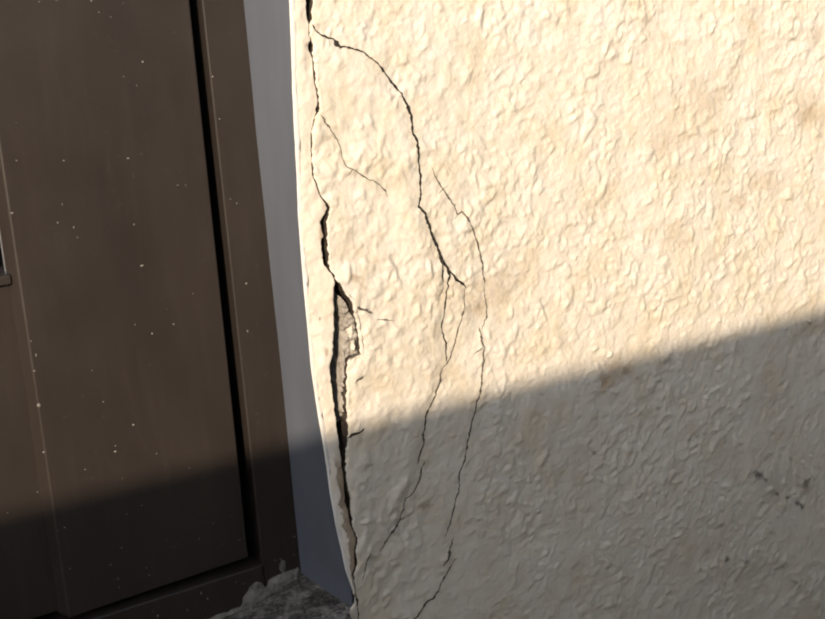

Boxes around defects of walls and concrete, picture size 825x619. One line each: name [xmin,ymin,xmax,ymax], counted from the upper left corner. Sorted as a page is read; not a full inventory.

crack [312,24,488,619]